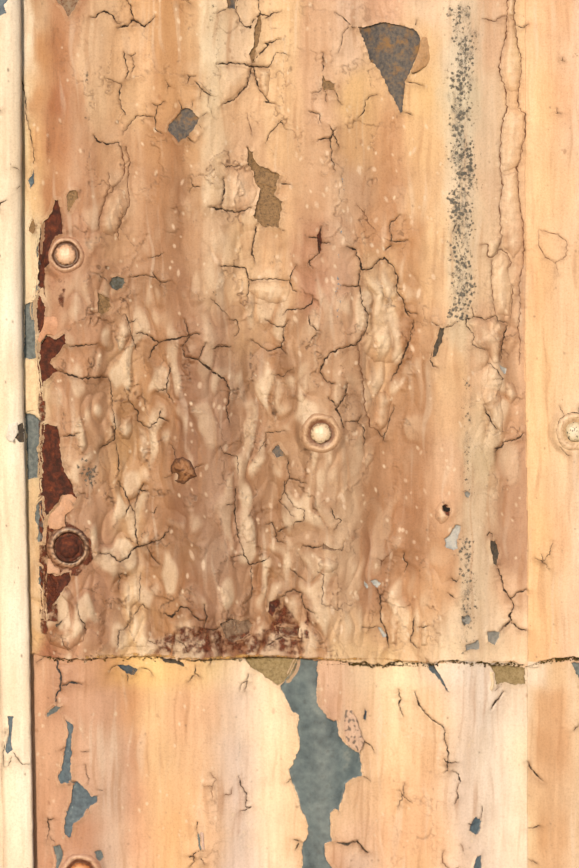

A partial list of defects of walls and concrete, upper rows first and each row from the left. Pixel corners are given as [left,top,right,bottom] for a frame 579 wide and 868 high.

peeling [165,103,206,146]
crack [92,0,287,236]
peeling [243,145,290,232]
peeling [339,15,430,117]
crack [209,0,568,443]
mould [447,5,477,322]
rust [33,196,93,634]
crack [60,299,239,647]
rust [156,600,309,654]
peeling [43,702,99,868]
peeling [243,657,374,868]
crack [398,689,461,803]